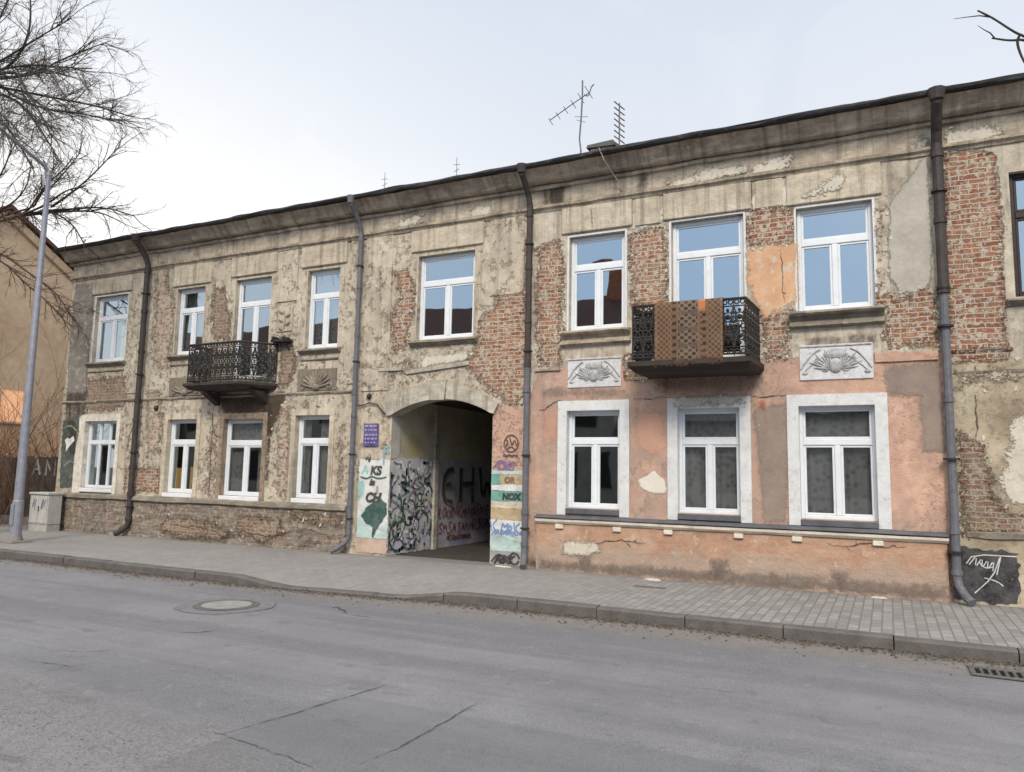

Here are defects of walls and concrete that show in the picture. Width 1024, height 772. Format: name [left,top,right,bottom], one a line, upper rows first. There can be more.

spalling [626,206,669,310]
peeling [667,154,846,363]
spalling [83,374,127,414]
spalling [122,387,164,494]
spalling [388,238,567,406]
spalling [873,148,1024,541]
spalling [560,538,603,559]